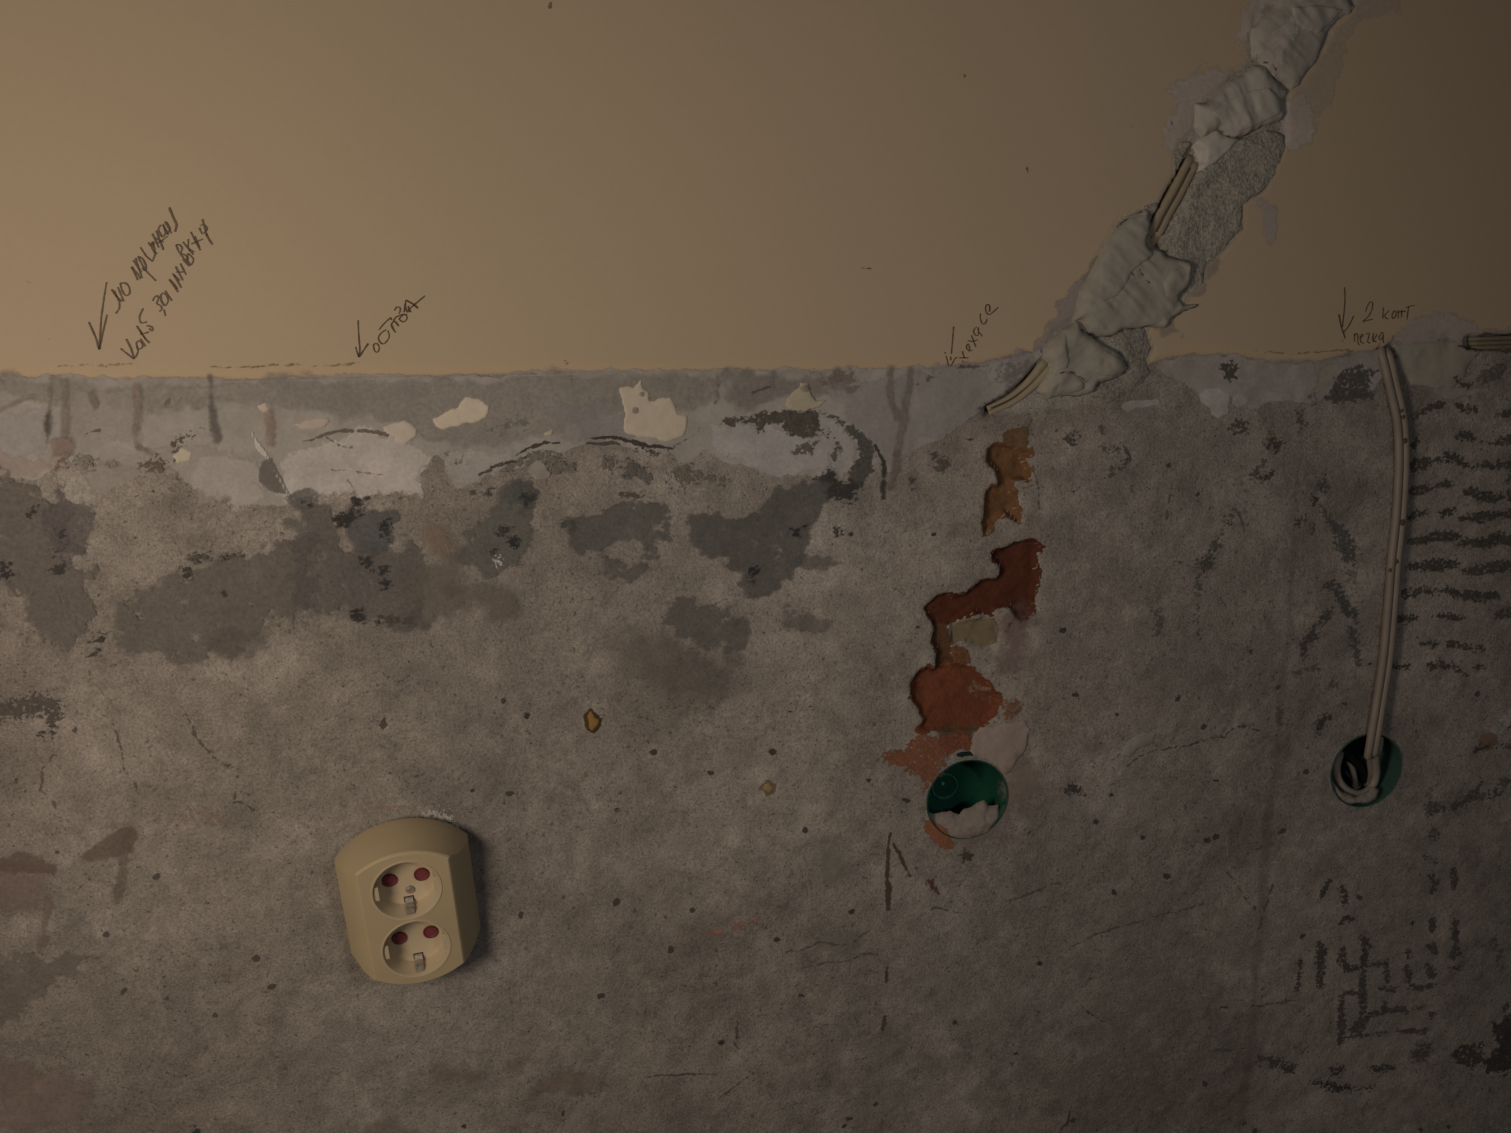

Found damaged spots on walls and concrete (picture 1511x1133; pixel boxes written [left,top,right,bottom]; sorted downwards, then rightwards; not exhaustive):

damp [2,380,74,457]
damp [208,376,221,442]
peeling [1153,350,1382,418]
damp [0,474,428,665]
damp [452,480,538,580]
peeling [0,358,1046,809]
damp [560,477,834,599]
damp [663,597,749,654]
spalling [924,820,974,864]